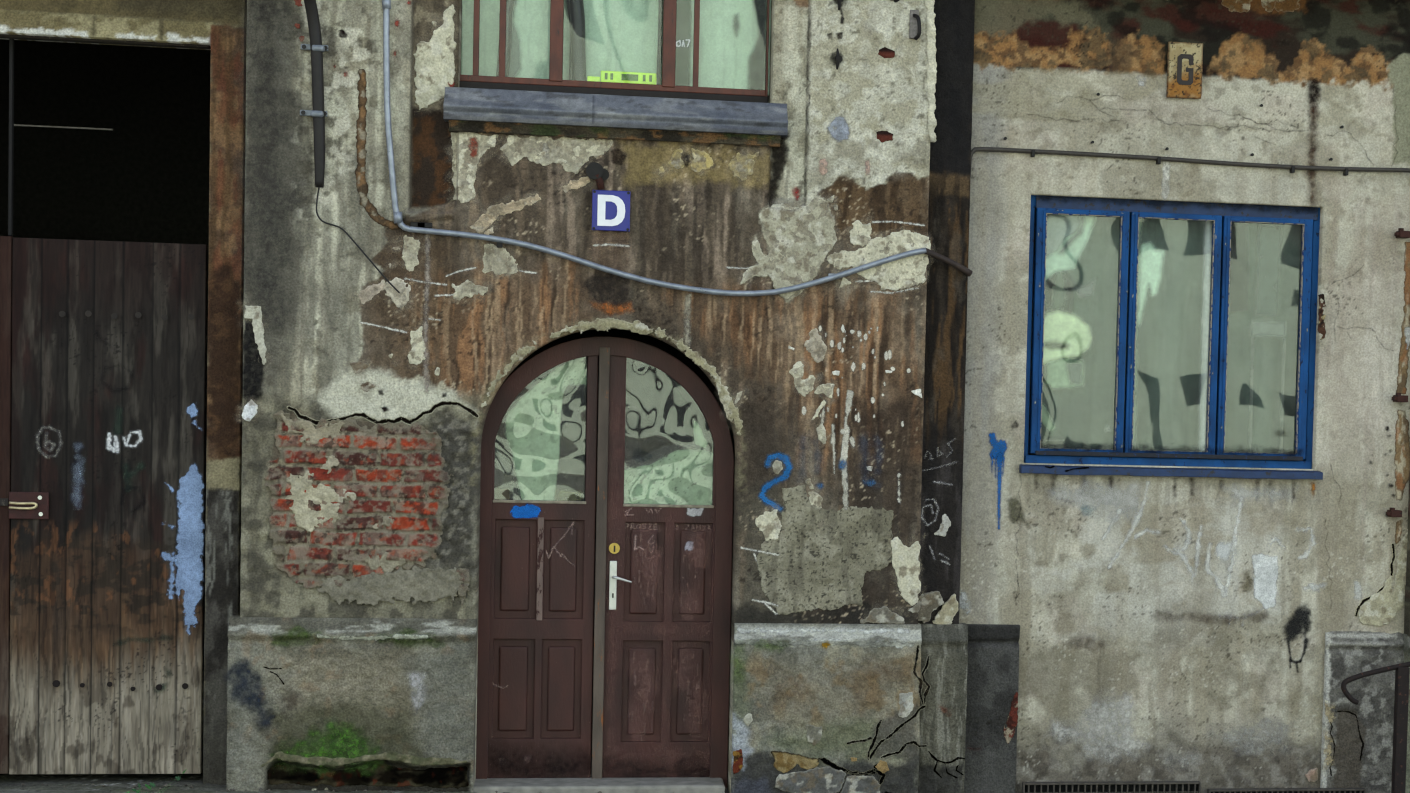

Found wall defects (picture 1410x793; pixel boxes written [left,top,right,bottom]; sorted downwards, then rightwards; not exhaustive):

flaking render [413,4,457,110]
flaking render [1221,0,1300,13]
flaking render [451,132,613,300]
flaking render [658,148,759,181]
flaking render [740,195,931,300]
flaking render [788,328,840,444]
flaking render [242,305,470,606]
flaking render [755,460,958,624]
flaking render [1358,529,1408,626]
crack [817,645,974,793]